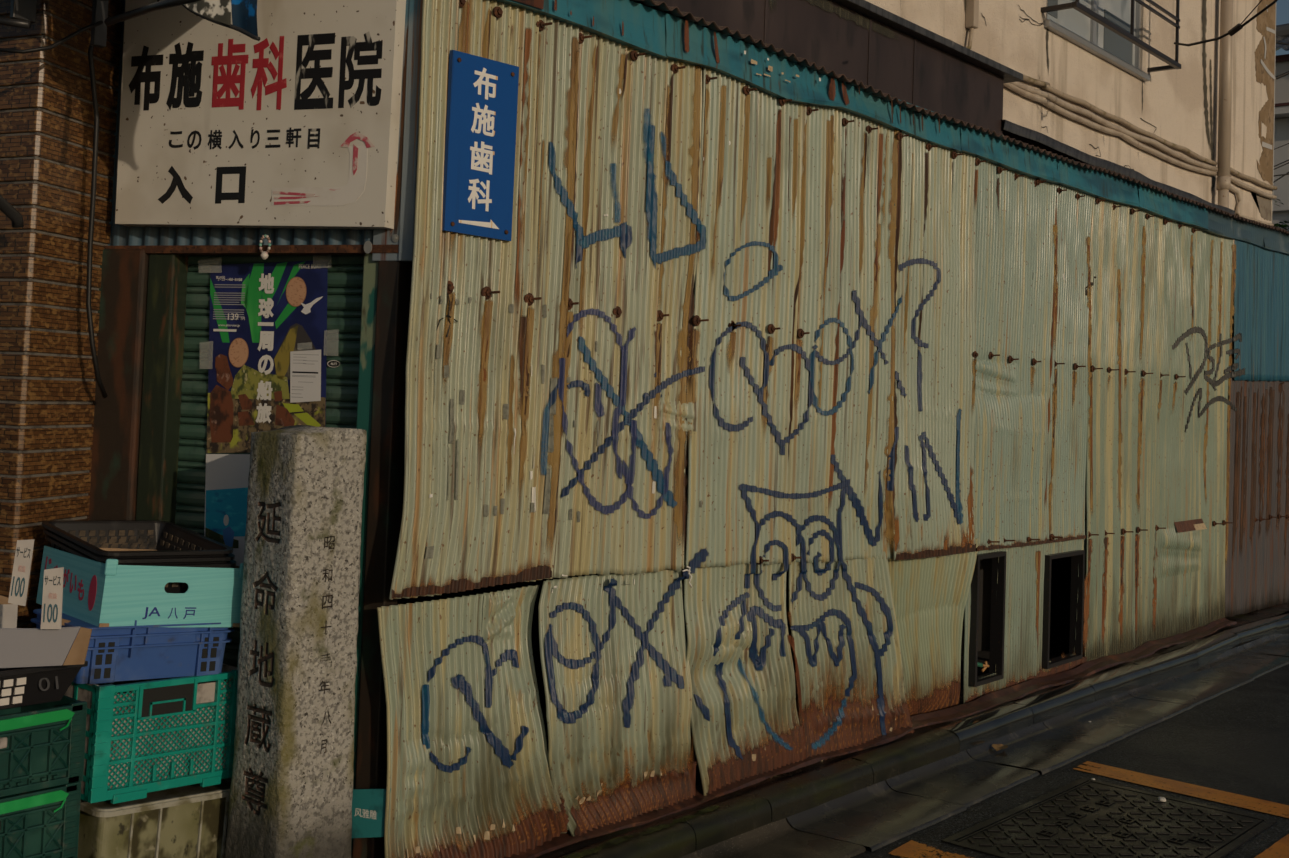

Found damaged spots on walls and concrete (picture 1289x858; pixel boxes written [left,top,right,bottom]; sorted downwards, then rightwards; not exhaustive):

rust [458,2,491,59]
spalling [1251,0,1276,221]
rust [390,20,1158,858]
rust [1109,269,1177,508]
rust [1190,235,1289,560]